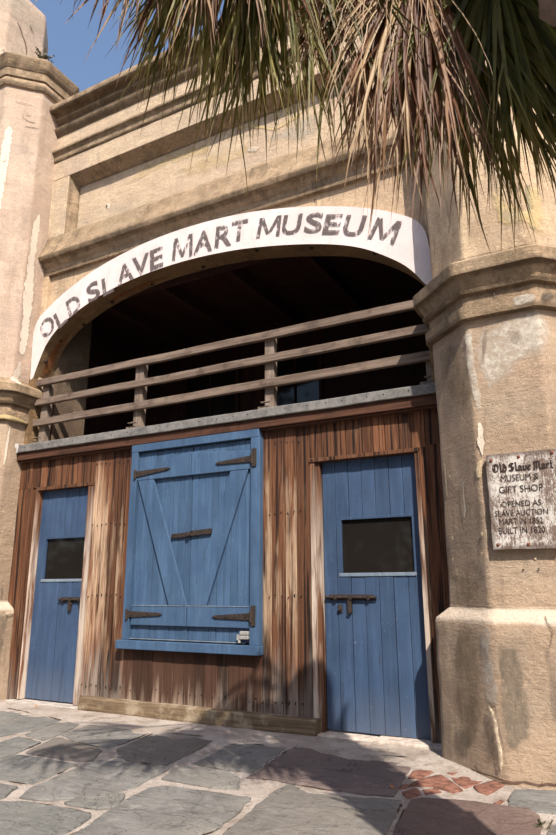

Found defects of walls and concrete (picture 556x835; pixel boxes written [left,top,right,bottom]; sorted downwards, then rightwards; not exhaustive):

peeling [0,125,13,209]
peeling [10,214,40,385]
peeling [465,333,481,408]
peeling [475,422,485,478]
leakage [500,649,528,747]